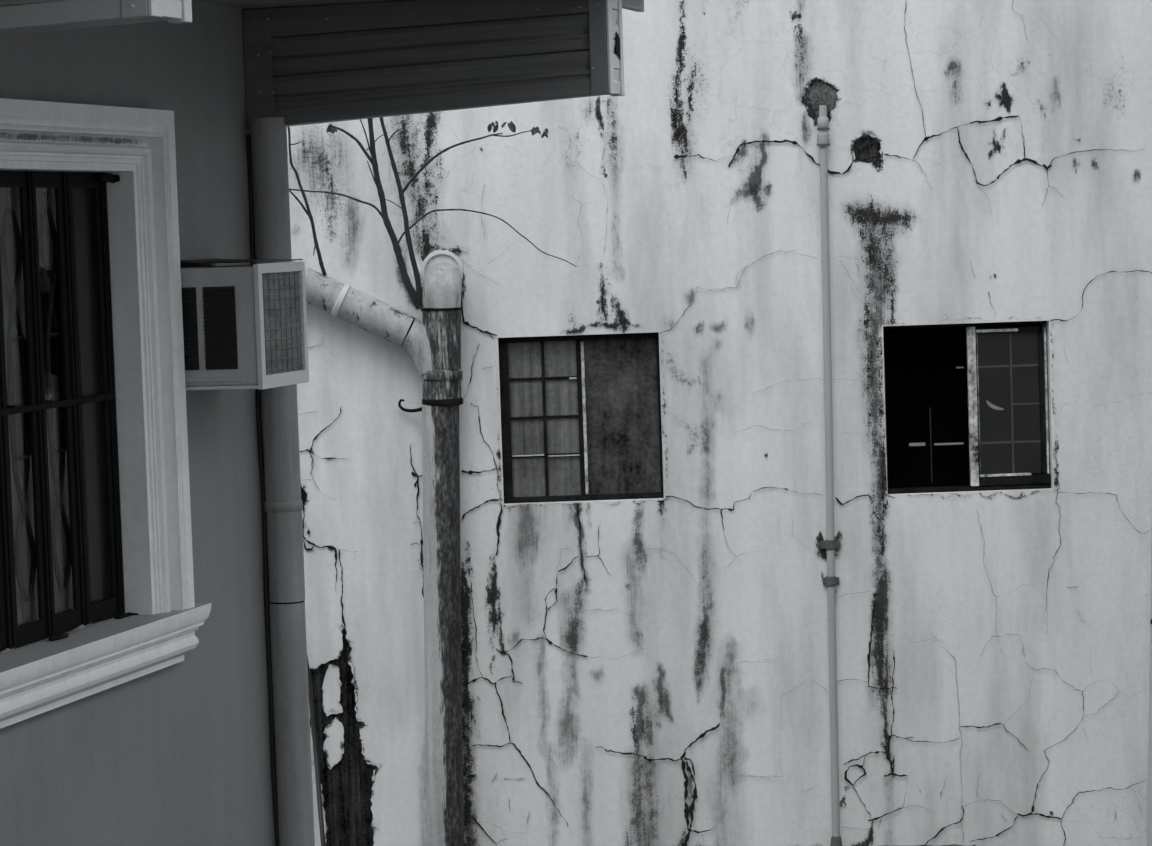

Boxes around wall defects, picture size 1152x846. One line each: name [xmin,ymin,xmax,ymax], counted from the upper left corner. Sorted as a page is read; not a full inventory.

leakage [395,112,466,306]
leakage [670,0,710,178]
leakage [732,134,771,212]
spalling [799,76,841,127]
spalling [851,131,884,172]
crack [884,0,1144,213]
leakage [845,195,966,777]
spalling [309,625,382,846]
leakage [460,542,516,846]
crack [462,504,647,826]
crack [602,655,780,846]
crack [727,492,1150,846]